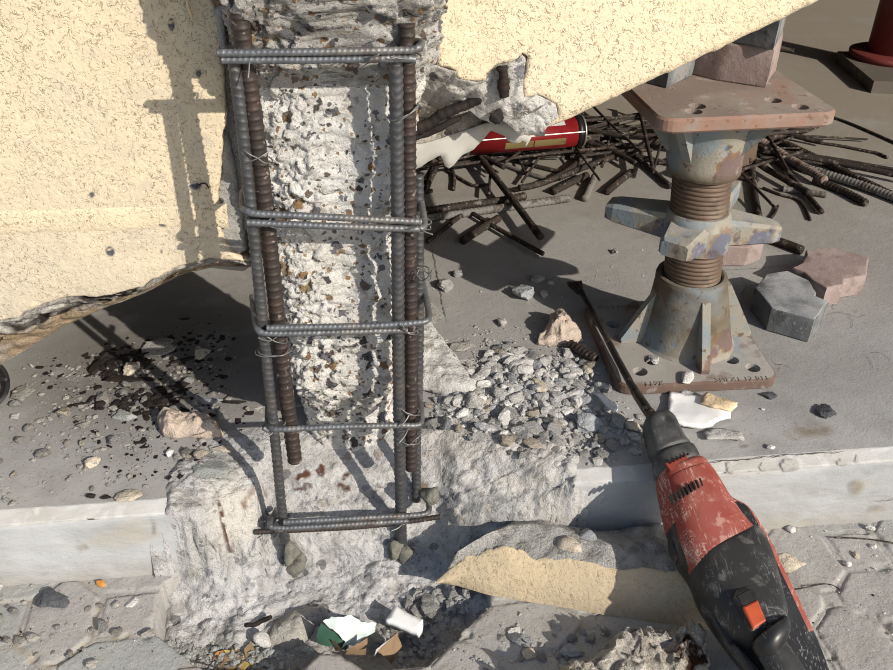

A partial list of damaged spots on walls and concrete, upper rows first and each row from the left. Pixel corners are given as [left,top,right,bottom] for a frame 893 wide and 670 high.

peeling [112,409,137,421]
spalling [0,131,251,365]
corrosion [229,0,254,49]
corrosion [241,64,286,325]
corrosion [271,337,325,490]
spalling [213,0,558,169]
corrosion [398,23,417,218]
corrosion [404,232,418,472]
peeling [424,302,444,324]